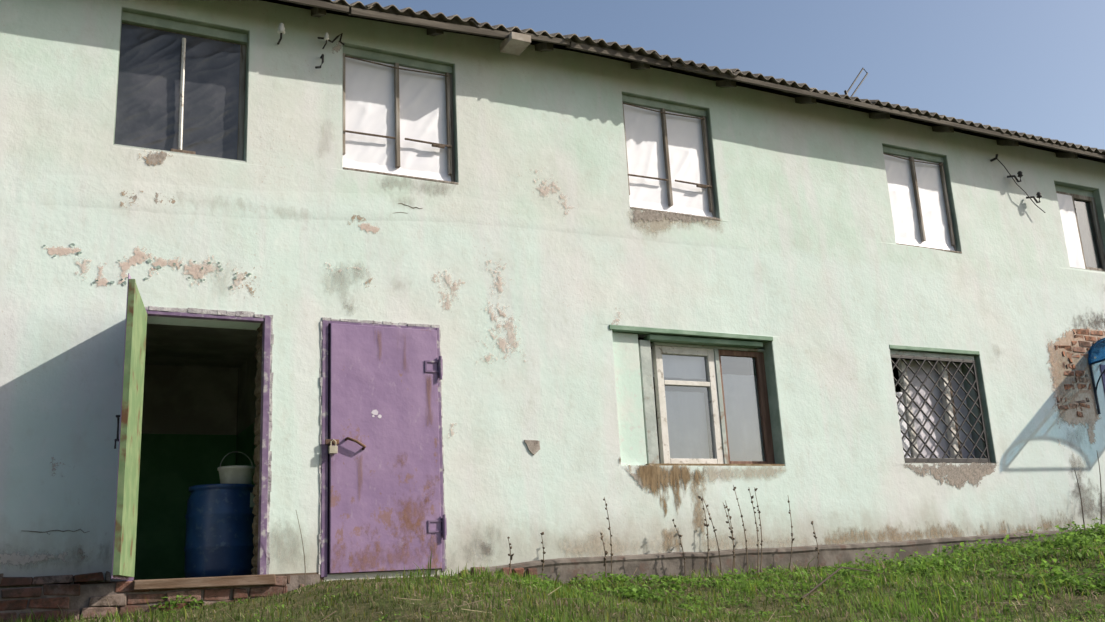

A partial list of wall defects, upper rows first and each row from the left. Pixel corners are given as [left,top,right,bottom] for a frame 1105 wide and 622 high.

peeling [43,243,256,297]
spalling [348,215,380,234]
peeling [476,260,521,363]
spalling [1046,327,1105,444]